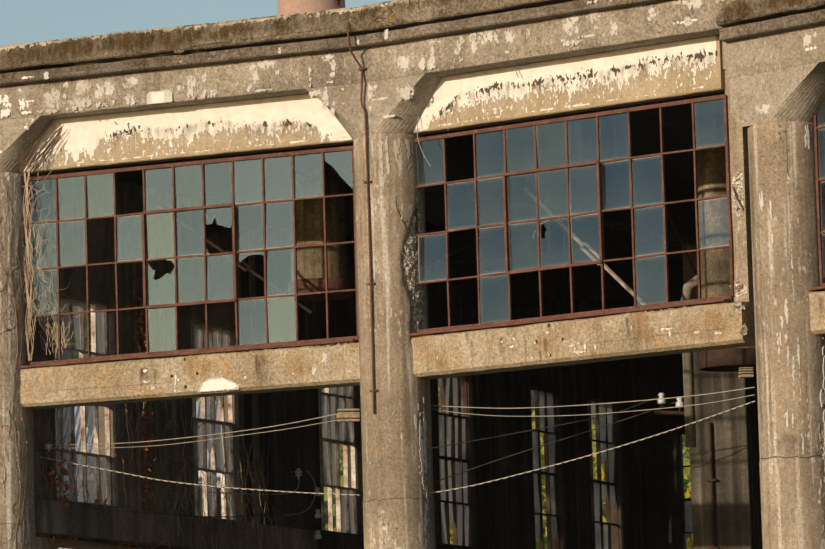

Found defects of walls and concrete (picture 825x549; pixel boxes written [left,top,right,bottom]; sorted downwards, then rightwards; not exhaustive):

peeling [450,29,515,65]
peeling [561,0,618,47]
peeling [672,0,702,28]
peeling [368,39,445,111]
peeling [416,36,717,131]
peeling [0,47,353,172]
efflorescence [371,136,411,185]
damp [752,191,772,222]
damp [0,172,25,365]
spalling [401,211,425,337]
crack [761,453,823,463]